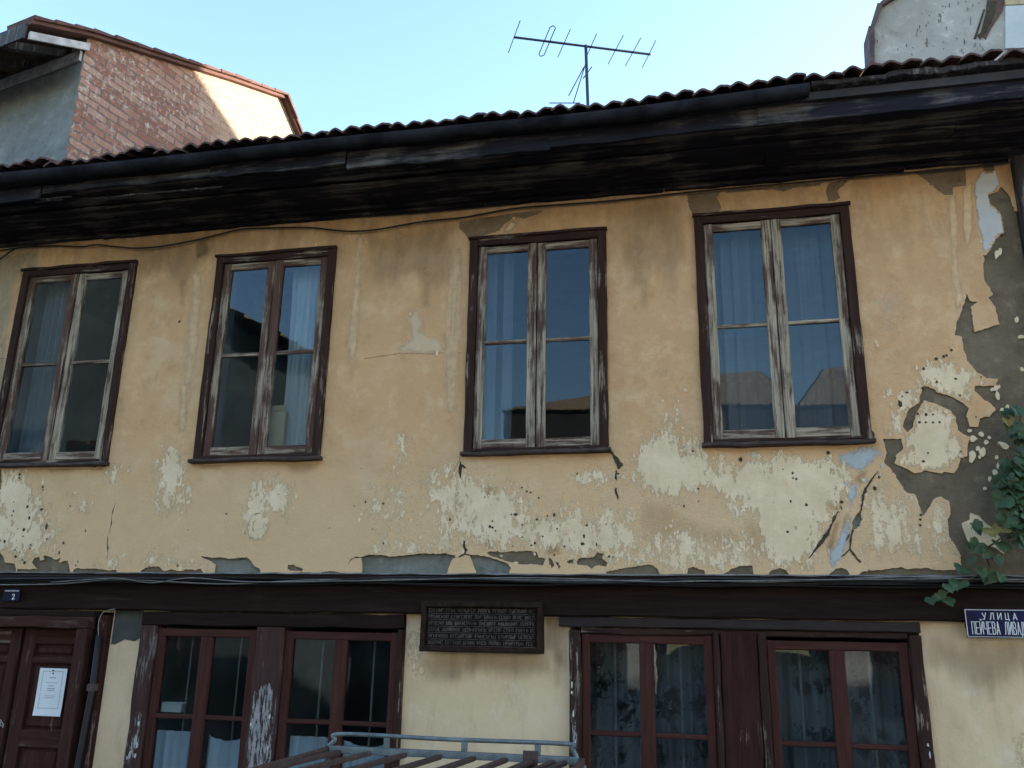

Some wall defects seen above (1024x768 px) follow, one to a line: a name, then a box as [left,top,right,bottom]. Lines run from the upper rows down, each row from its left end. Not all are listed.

flaking render [354,166,1024,575]
peeling [0,469,260,573]
peeling [149,436,193,531]
peeling [225,472,298,539]
crack [611,451,623,499]
crack [809,472,878,563]
peeling [248,683,275,768]